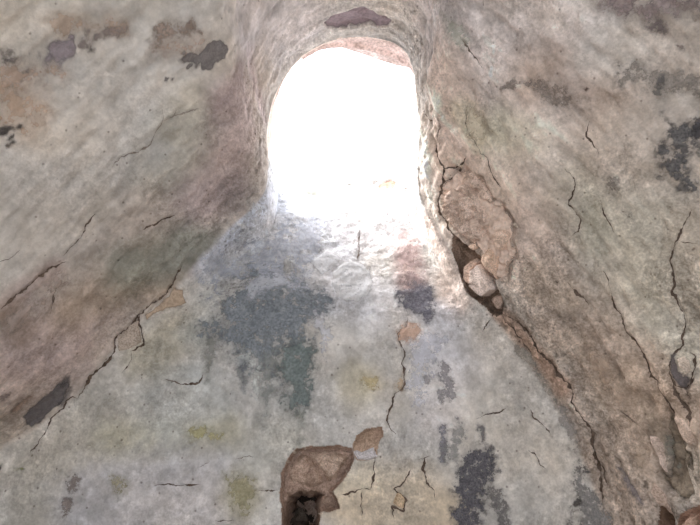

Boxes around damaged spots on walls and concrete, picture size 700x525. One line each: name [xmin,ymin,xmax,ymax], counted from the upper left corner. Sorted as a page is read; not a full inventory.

leakage [181,40,228,70]
spalling [324,7,391,27]
mould [658,118,700,192]
spalling [442,163,518,316]
leakage [23,377,70,427]
crack [30,268,181,452]
leakage [194,206,335,411]
crack [386,319,408,434]
crack [478,295,608,504]
crack [603,211,697,426]
spalling [279,427,384,525]
leakage [439,417,511,525]